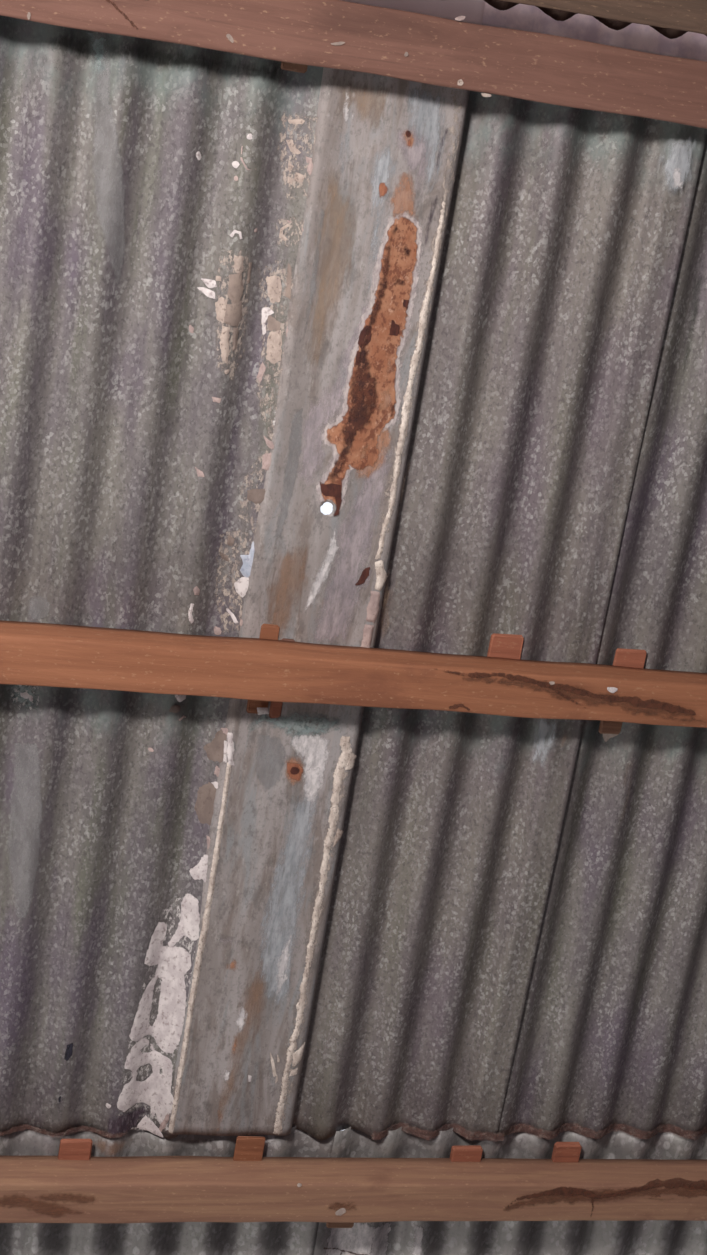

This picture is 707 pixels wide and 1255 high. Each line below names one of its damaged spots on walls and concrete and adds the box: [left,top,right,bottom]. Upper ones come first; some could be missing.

peeling [232,134,252,181]
peeling [278,114,318,199]
peeling [276,217,304,247]
corrosion [316,174,422,516]
peeling [197,228,293,635]
peeling [188,586,200,623]
peeling [106,728,235,1138]